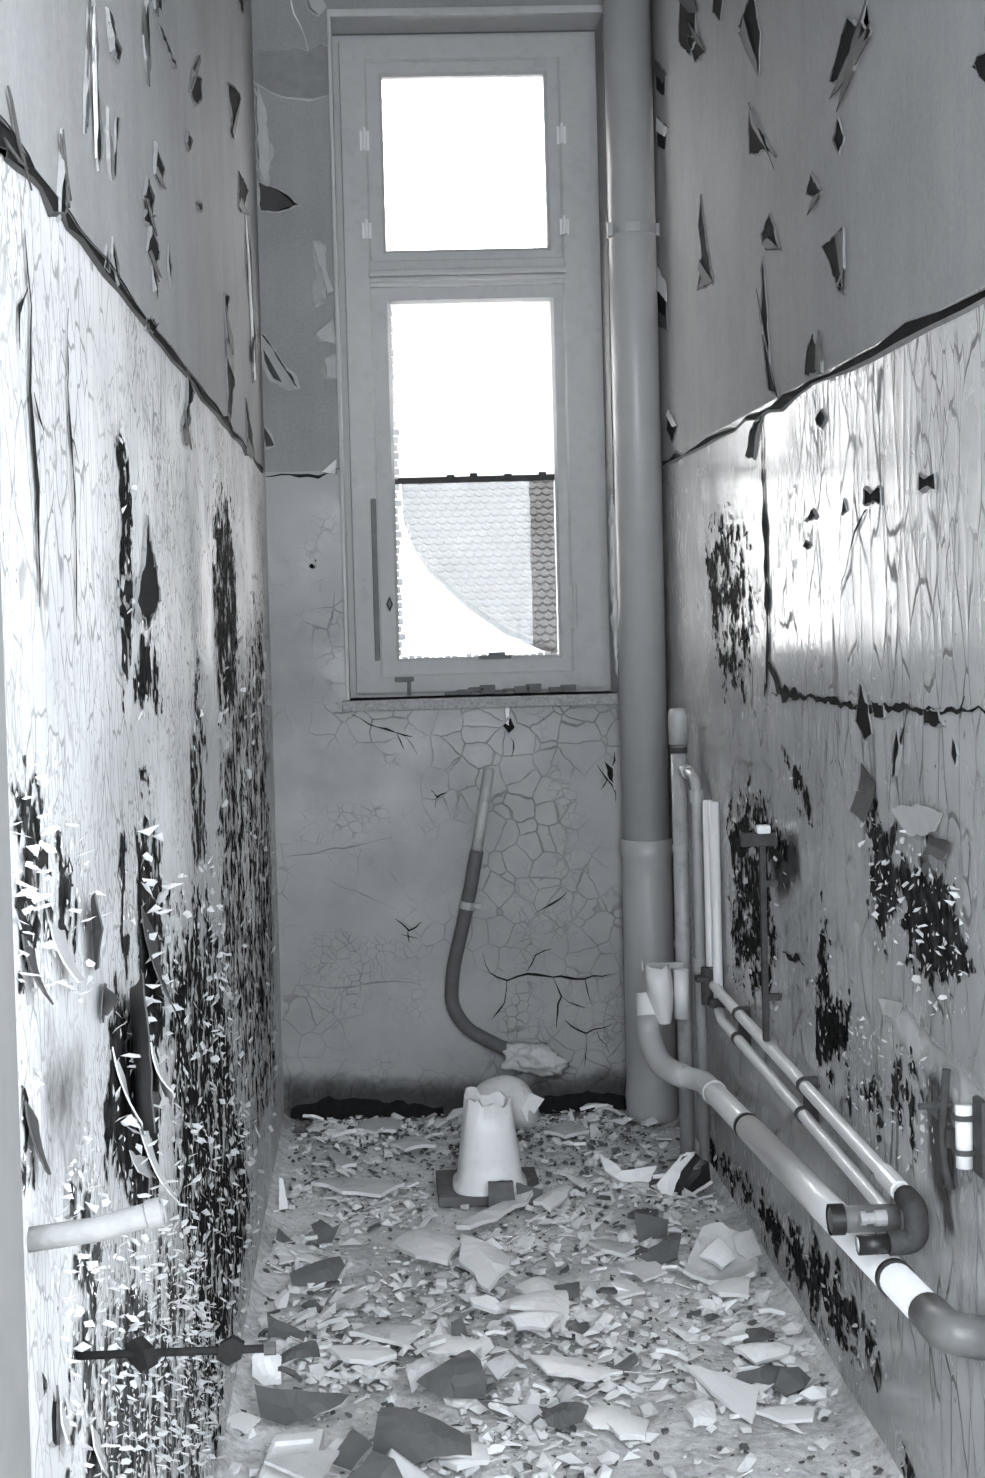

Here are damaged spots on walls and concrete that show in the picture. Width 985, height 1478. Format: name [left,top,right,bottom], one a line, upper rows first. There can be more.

peeling [678,0,762,77]
peeling [829,0,872,156]
spalling [0,43,329,473]
peeling [697,194,714,291]
crack [18,234,79,646]
peeling [114,423,163,744]
crack [761,427,985,762]
crack [351,714,416,752]
peeling [10,472,443,1478]
crack [282,836,421,1013]
crack [483,949,612,1066]
crack [783,951,804,966]